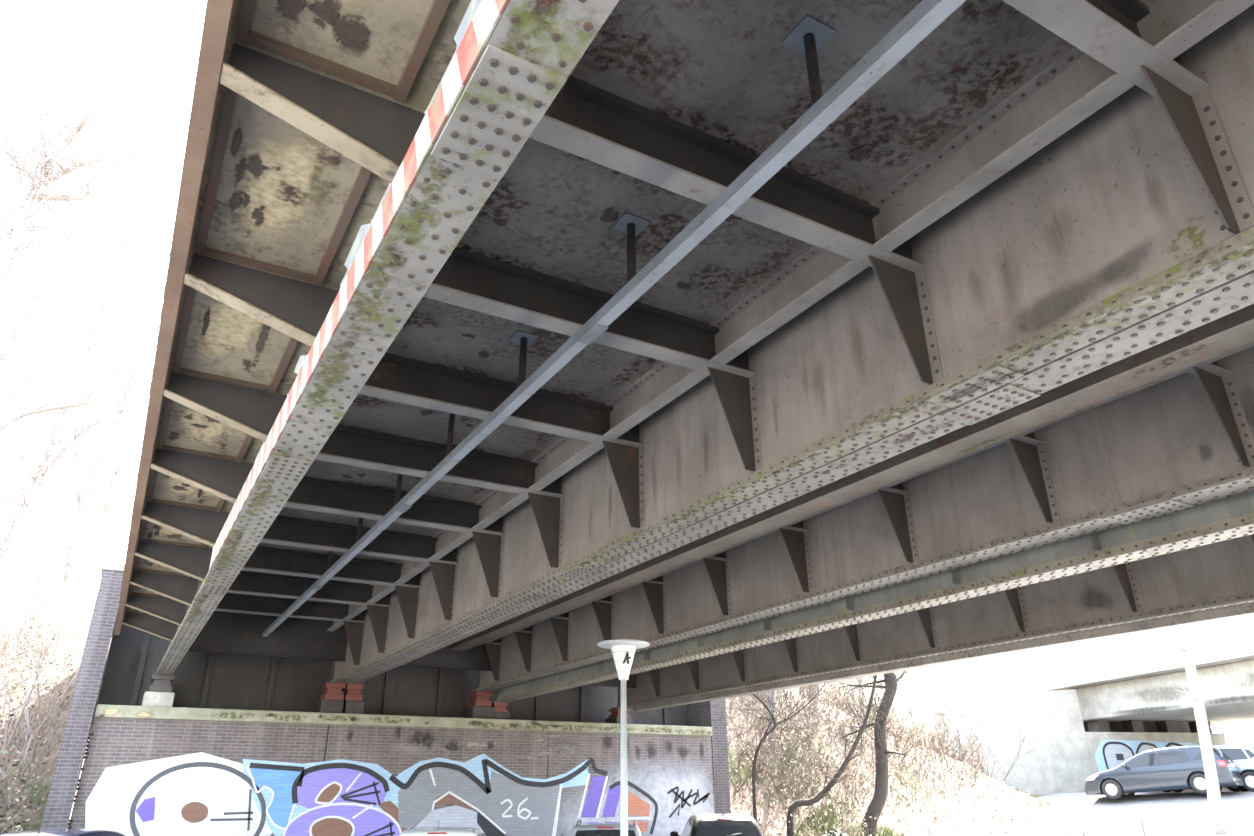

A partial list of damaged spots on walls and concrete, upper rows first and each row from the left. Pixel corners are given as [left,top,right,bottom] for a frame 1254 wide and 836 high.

corrosion [963,0,1017,23]
corrosion [585,17,657,75]
corrosion [819,52,1021,166]
corrosion [480,178,529,226]
corrosion [600,209,620,222]
corrosion [636,214,688,253]
corrosion [677,241,793,298]